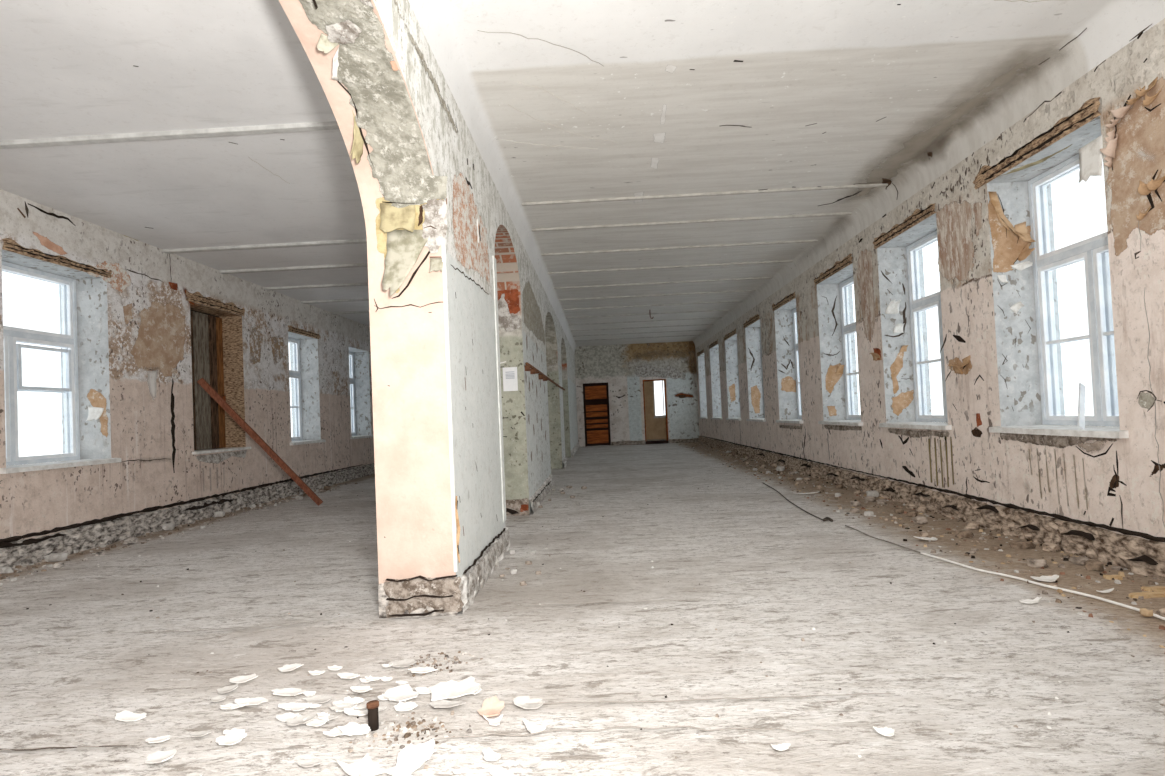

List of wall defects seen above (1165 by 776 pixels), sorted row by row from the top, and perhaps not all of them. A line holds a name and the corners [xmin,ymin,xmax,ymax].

crack [478,30,603,66]
peeling [299,0,558,395]
peeling [1000,77,1165,256]
spalling [87,261,186,398]
peeling [249,325,283,364]
spalling [383,496,510,618]
spalling [506,481,553,514]